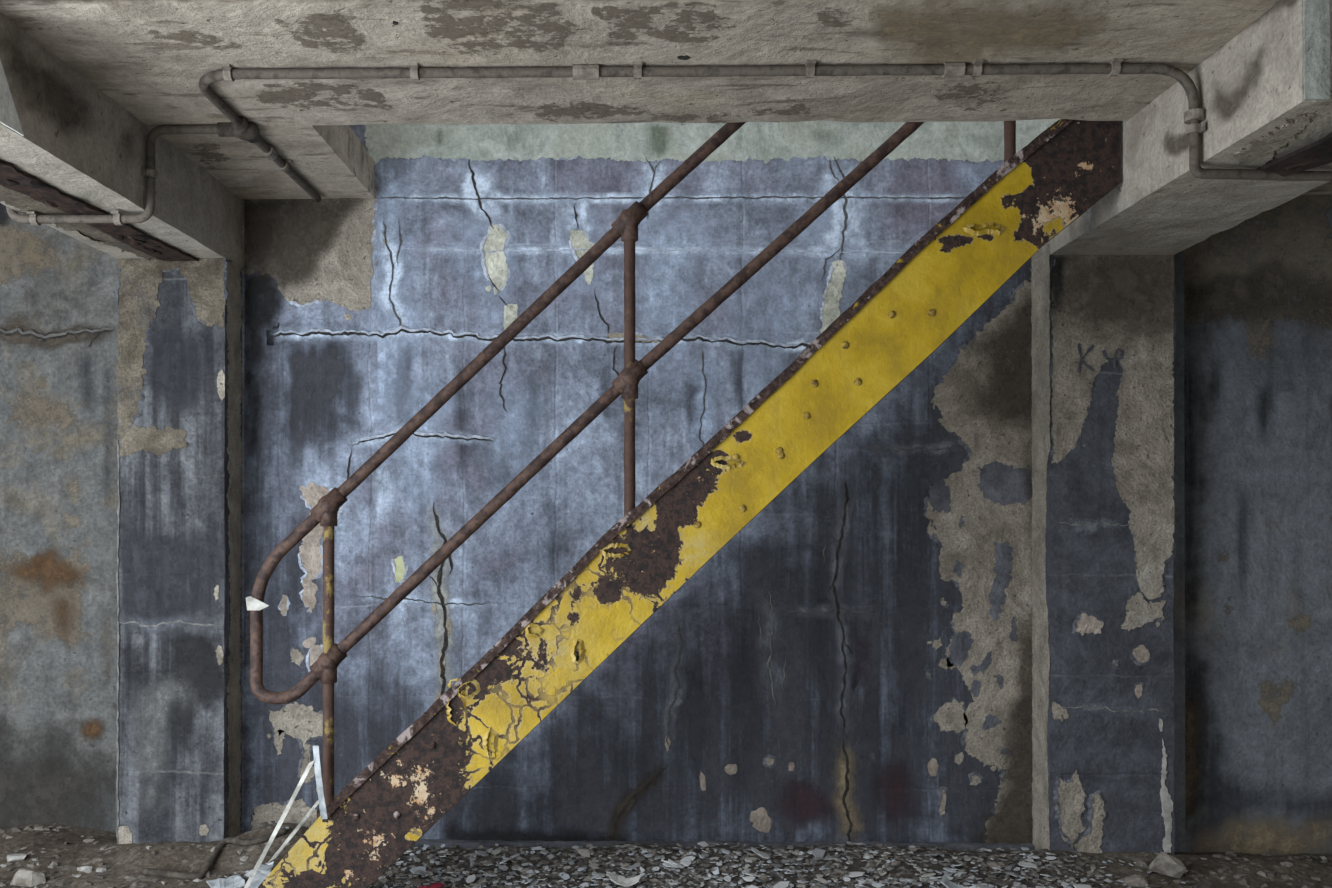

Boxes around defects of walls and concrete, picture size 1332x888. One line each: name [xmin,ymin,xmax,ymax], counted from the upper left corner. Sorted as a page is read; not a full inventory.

leakage [274,10,365,53]
leakage [420,0,576,56]
leakage [591,2,735,45]
crack [0,325,115,349]
crack [271,156,968,479]
corrosion [15,551,79,590]
peeling [0,185,304,844]
peeling [278,482,333,616]
leakage [244,198,418,810]
crack [359,502,494,695]
peeling [923,195,1332,855]
peeling [250,702,323,830]